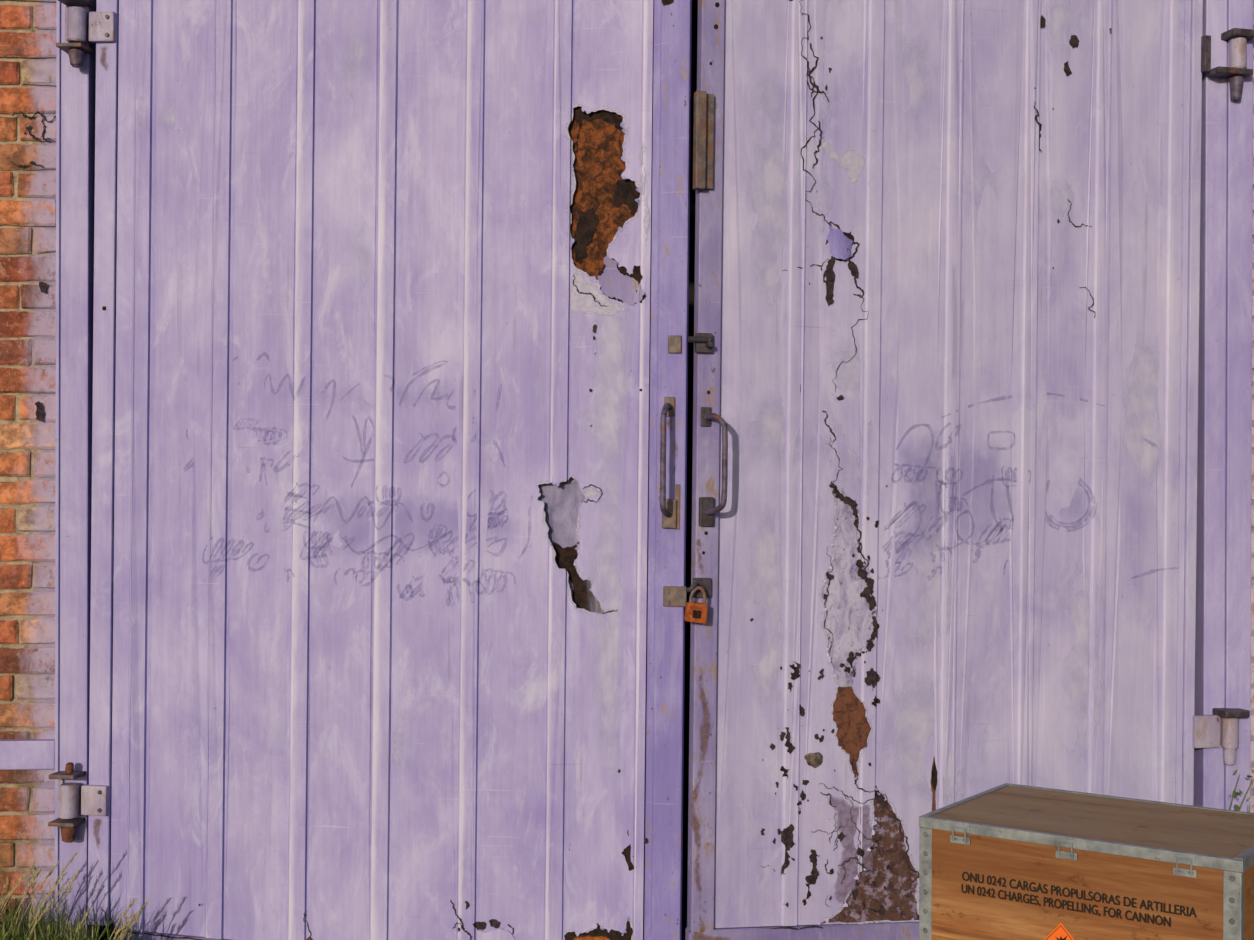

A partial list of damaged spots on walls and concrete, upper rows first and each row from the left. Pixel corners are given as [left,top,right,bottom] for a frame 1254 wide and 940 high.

peeling [590,256,645,305]
crack [783,0,869,496]
peeling [780,481,883,707]
peeling [761,704,919,916]
corrosion [817,679,919,925]
corrosion [564,916,634,940]